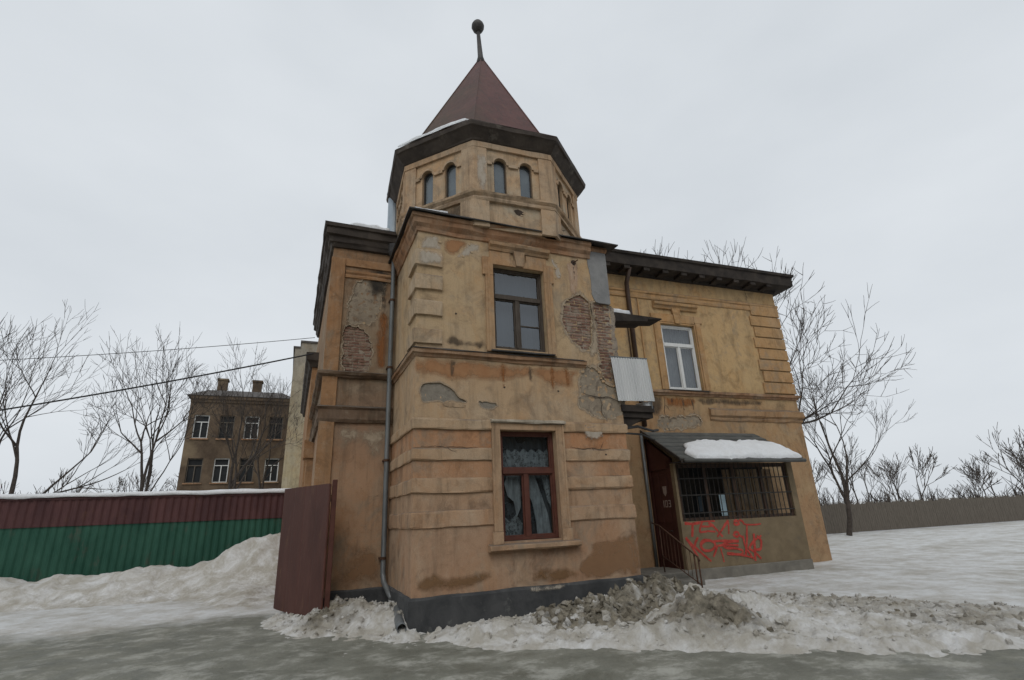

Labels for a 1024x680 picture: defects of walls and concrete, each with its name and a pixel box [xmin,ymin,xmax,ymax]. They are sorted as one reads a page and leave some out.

flaking render [340,279,387,372]
flaking render [560,291,625,440]
spalling [419,381,498,410]
damp [419,574,487,590]
damp [531,535,640,591]